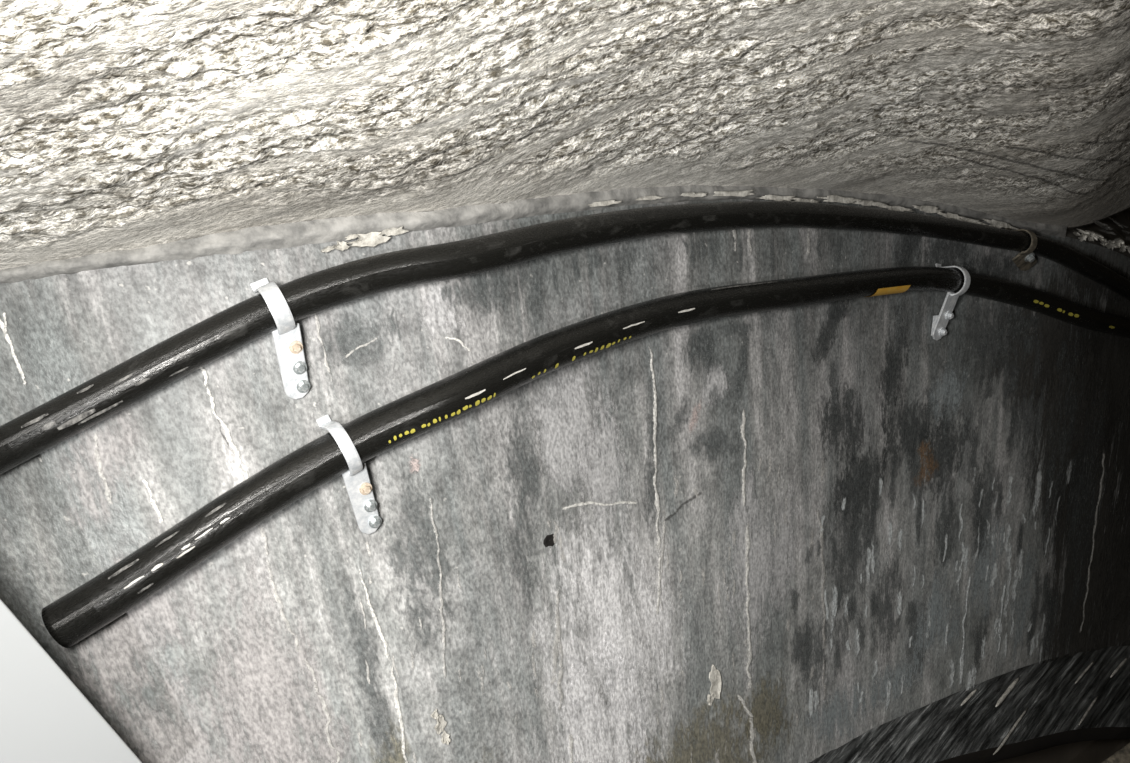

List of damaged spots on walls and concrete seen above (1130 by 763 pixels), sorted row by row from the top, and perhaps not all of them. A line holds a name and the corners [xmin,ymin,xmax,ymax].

damp [350,569,416,763]
damp [390,484,461,678]
damp [506,299,1130,763]